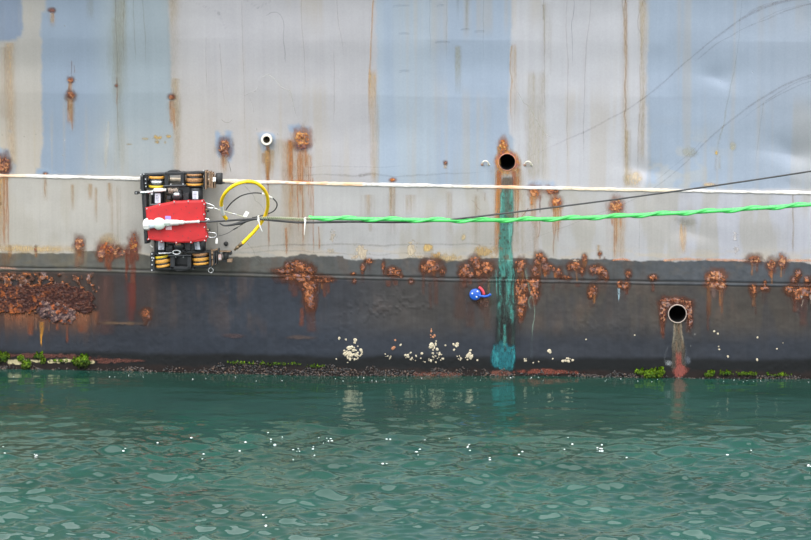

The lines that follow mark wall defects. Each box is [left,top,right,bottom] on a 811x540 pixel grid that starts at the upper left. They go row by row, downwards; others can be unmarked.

corrosion [218,138,230,157]
corrosion [287,128,311,182]
corrosion [421,139,520,278]
corrosion [529,189,562,216]
corrosion [0,267,99,344]
corrosion [273,260,334,323]
damp [491,178,515,370]
corrosion [514,252,631,319]
corrosion [659,297,693,327]
corrosion [705,270,726,290]
corrosion [736,255,811,306]
damp [666,322,690,378]